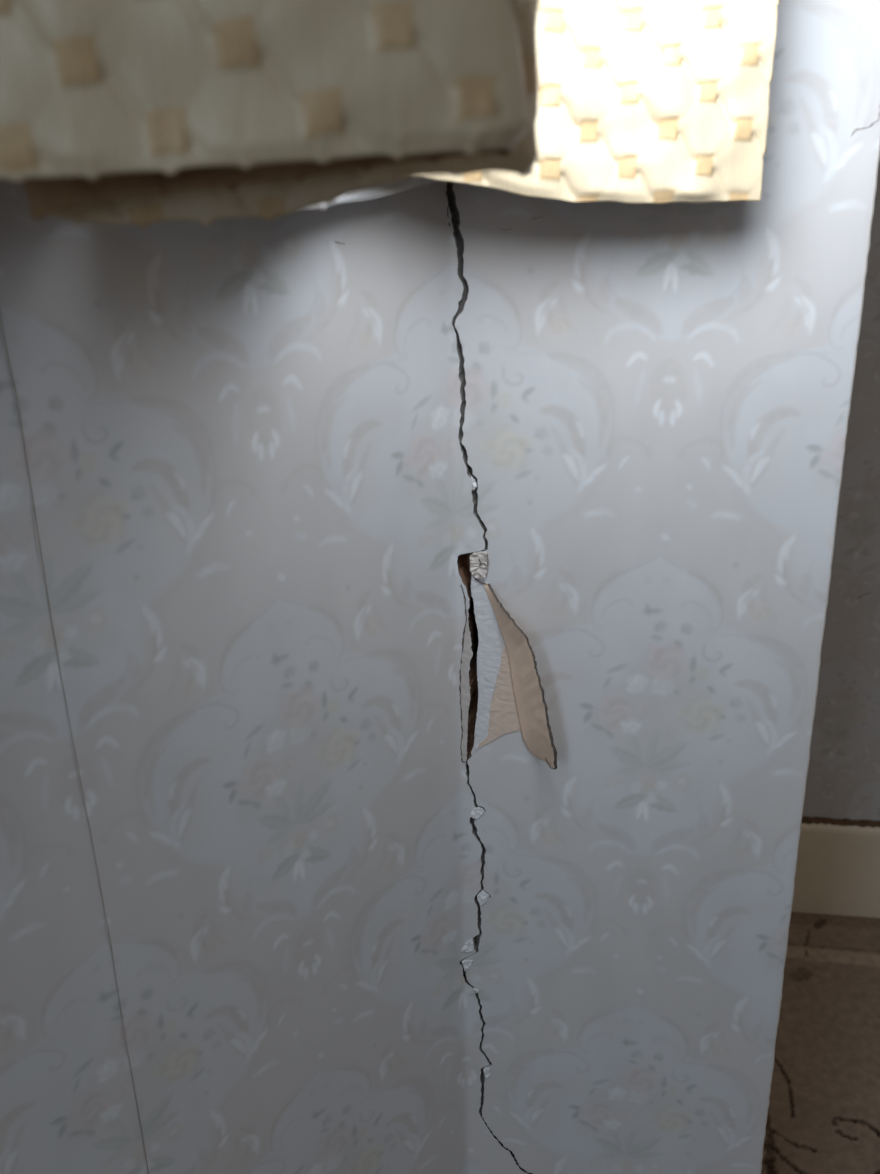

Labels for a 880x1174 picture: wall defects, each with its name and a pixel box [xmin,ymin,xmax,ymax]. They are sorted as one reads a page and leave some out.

crack [446,182,532,1174]